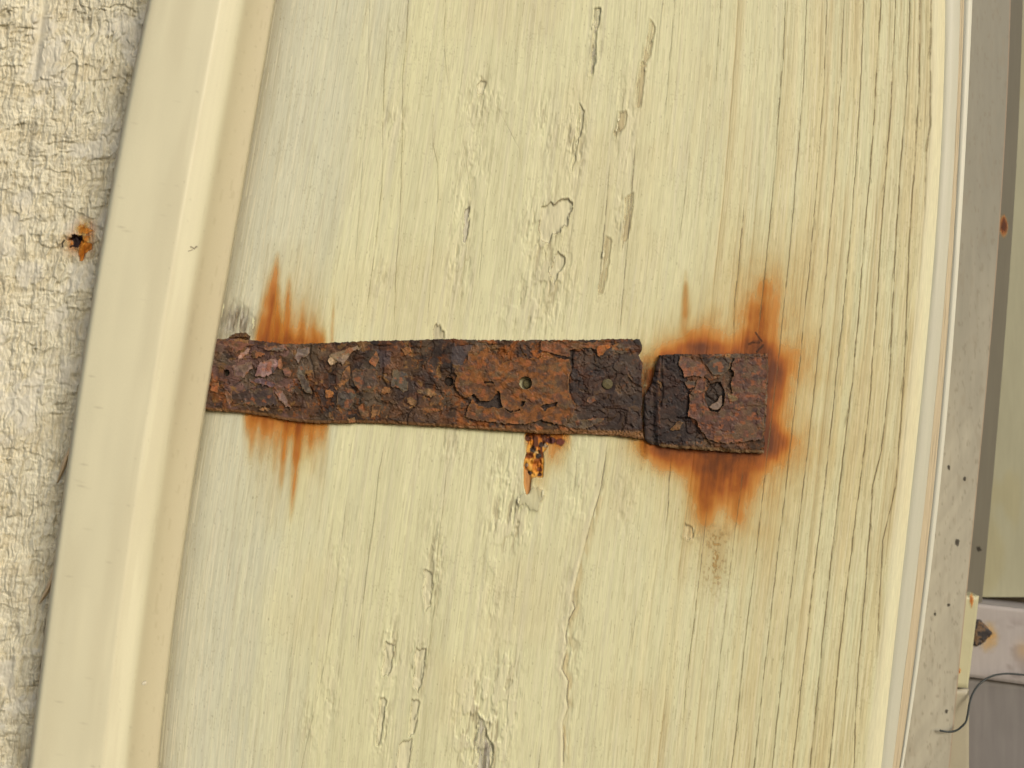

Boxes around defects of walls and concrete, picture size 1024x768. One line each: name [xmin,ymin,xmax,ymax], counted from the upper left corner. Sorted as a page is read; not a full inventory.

peeling [637,23,655,107]
corrosion [69,222,93,261]
peeling [538,198,573,284]
corrosion [210,266,328,497]
corrosion [325,345,443,423]
corrosion [454,341,611,459]
corrosion [633,278,801,527]
peeling [397,648,426,768]